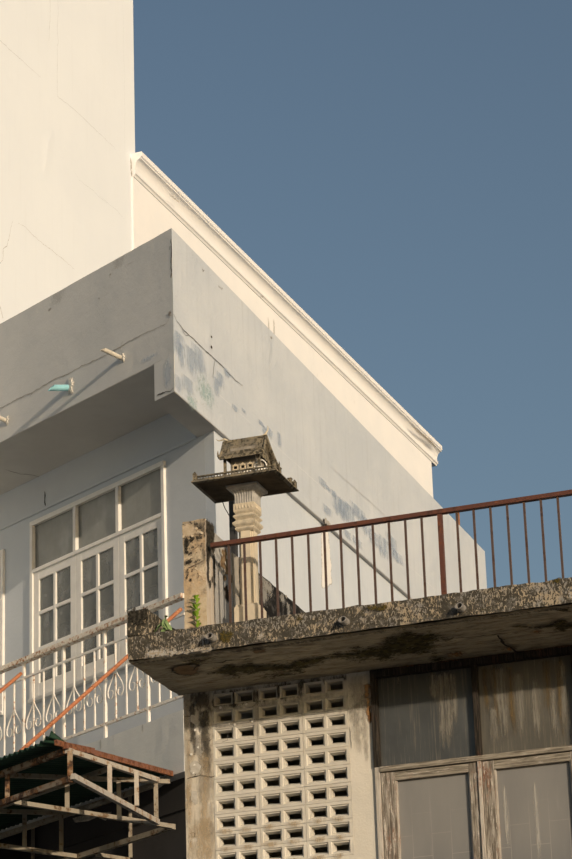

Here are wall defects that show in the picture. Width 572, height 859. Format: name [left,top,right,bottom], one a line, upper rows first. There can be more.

crack [1,315,243,408]
mould [184,519,216,588]
water stain [137,624,350,664]